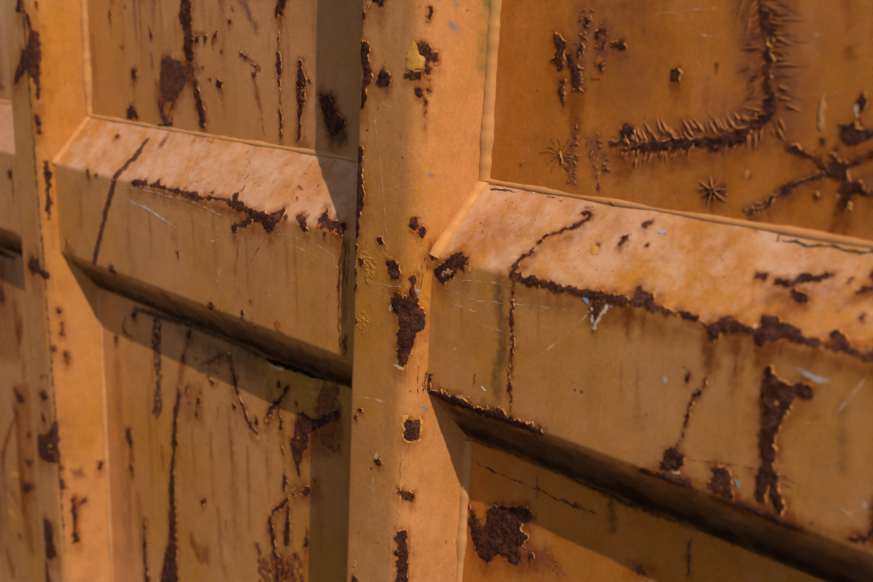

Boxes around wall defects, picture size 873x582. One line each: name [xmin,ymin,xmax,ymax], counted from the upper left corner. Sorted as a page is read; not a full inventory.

corrosion [152,0,223,129]
corrosion [274,0,286,141]
corrosion [296,58,312,142]
corrosion [319,92,346,140]
corrosion [360,38,442,113]
corrosion [551,8,627,107]
corrosion [609,0,873,229]
corrosion [130,145,366,292]
corrosion [386,259,427,370]
corrosion [514,270,873,532]
corrosion [255,380,341,582]
corrosion [468,499,565,582]